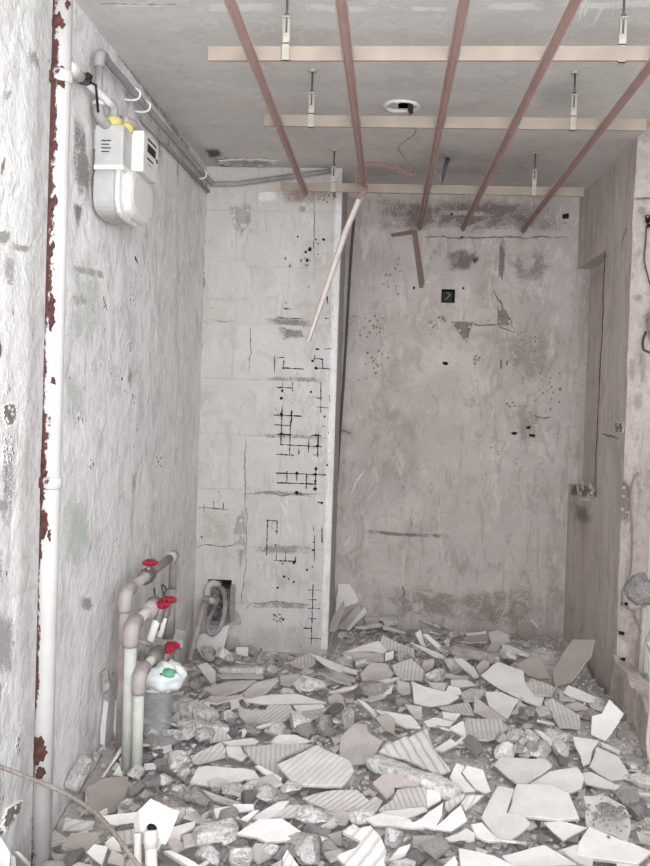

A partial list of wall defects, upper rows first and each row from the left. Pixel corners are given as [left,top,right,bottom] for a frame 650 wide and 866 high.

rust [52,0,71,29]
rust [48,193,58,213]
rust [48,292,56,332]
spalling [1,381,18,466]
rust [40,449,48,477]
rust [39,489,51,542]
crack [196,442,315,607]
rust [33,736,48,779]